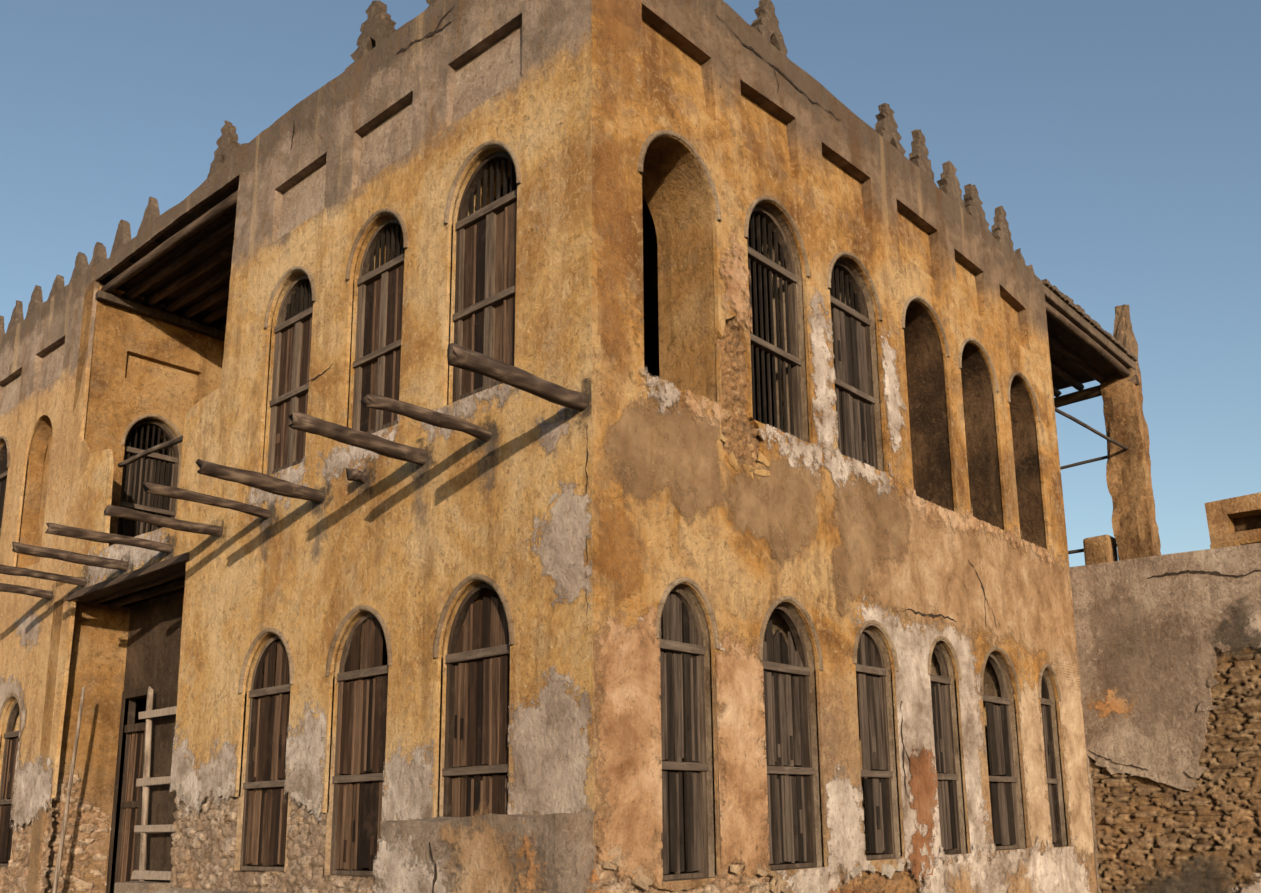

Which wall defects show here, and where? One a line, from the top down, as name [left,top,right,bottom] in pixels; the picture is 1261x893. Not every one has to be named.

peeling [525,480,592,610]
water stain [604,399,824,566]
water stain [832,476,911,616]
spalling [639,232,1261,893]
crack [1147,570,1261,579]
spalling [0,675,112,893]
spalling [169,702,450,893]
crack [428,842,437,893]
peeling [507,606,794,893]